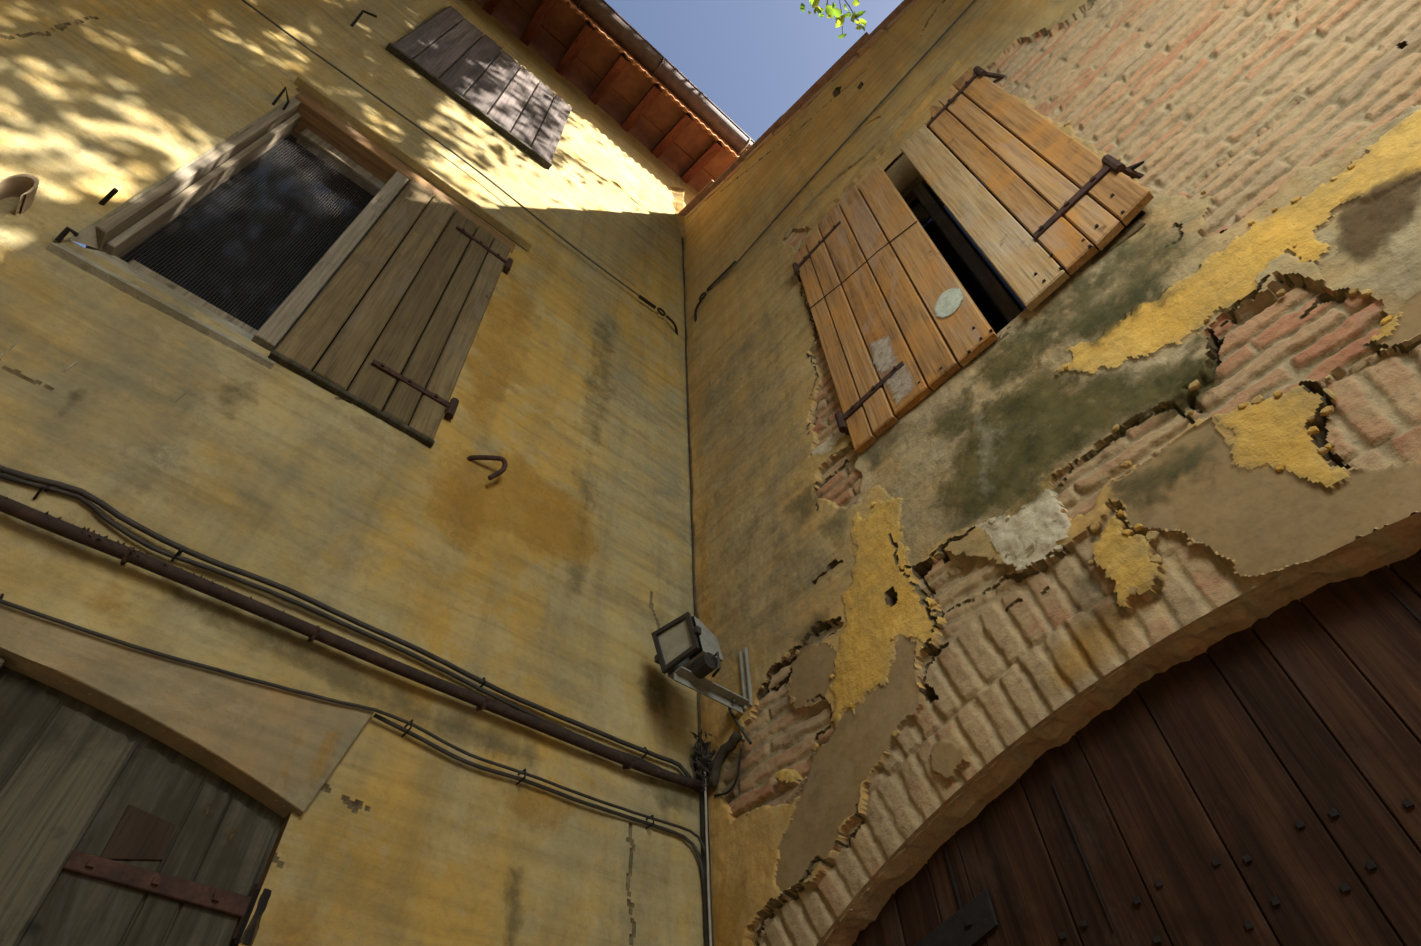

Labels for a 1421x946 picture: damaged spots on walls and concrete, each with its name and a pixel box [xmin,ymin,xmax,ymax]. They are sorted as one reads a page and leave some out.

leakage [1338,169,1421,259]
leakage [975,489,1071,573]
flaking render [722,0,1421,946]
crack [626,822,636,945]